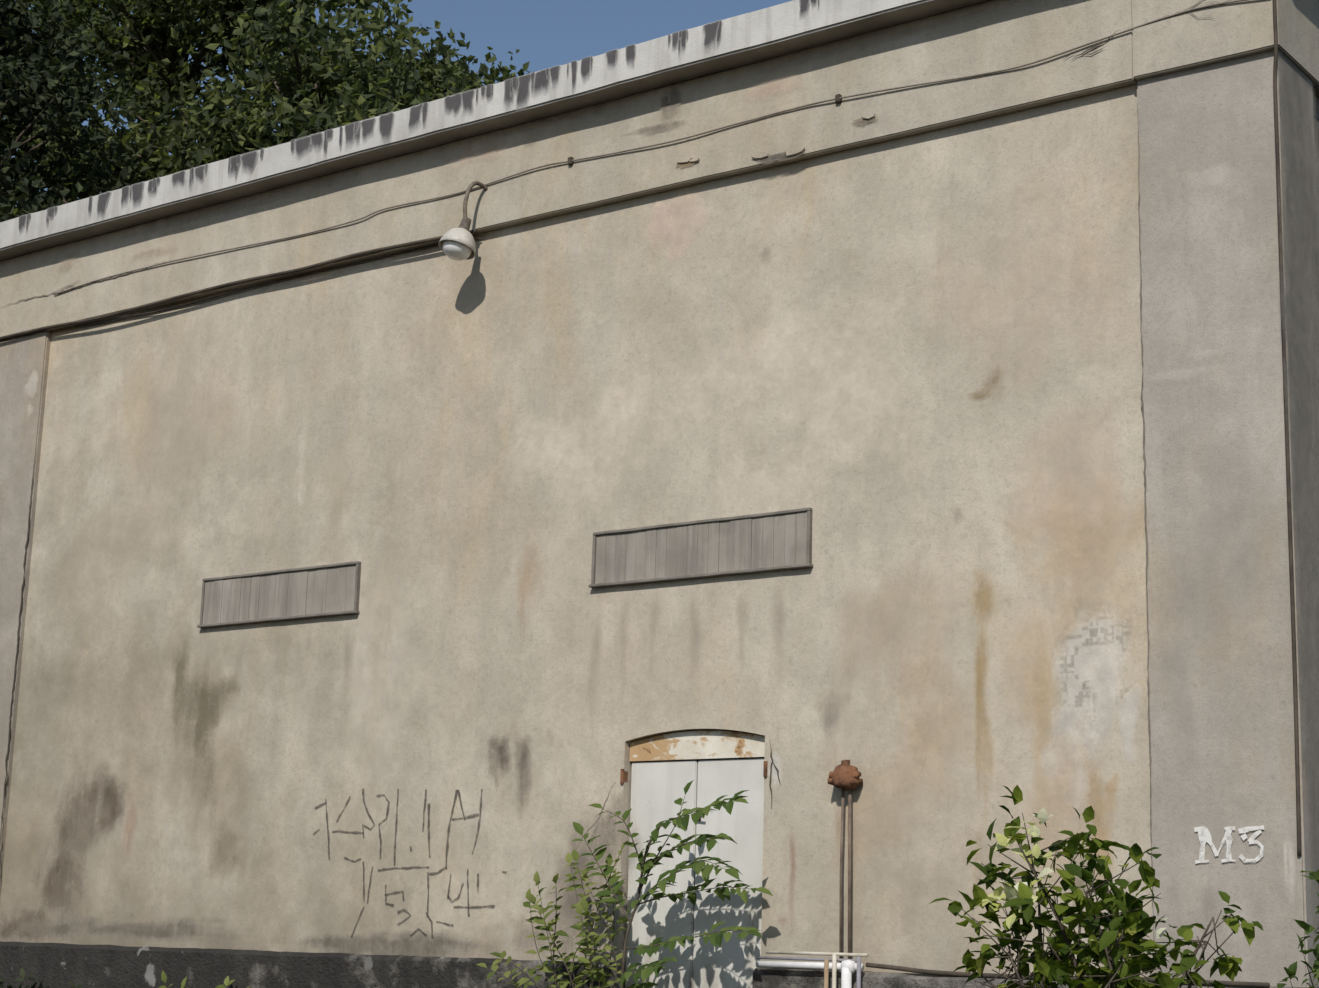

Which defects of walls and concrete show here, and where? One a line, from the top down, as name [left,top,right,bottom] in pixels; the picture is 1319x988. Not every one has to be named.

water stain [18,206,57,231]
water stain [88,164,208,216]
water stain [228,148,263,179]
water stain [174,649,236,780]
rust [976,641,987,749]
water stain [489,738,530,806]
water stain [0,767,202,942]
water stain [304,933,476,957]